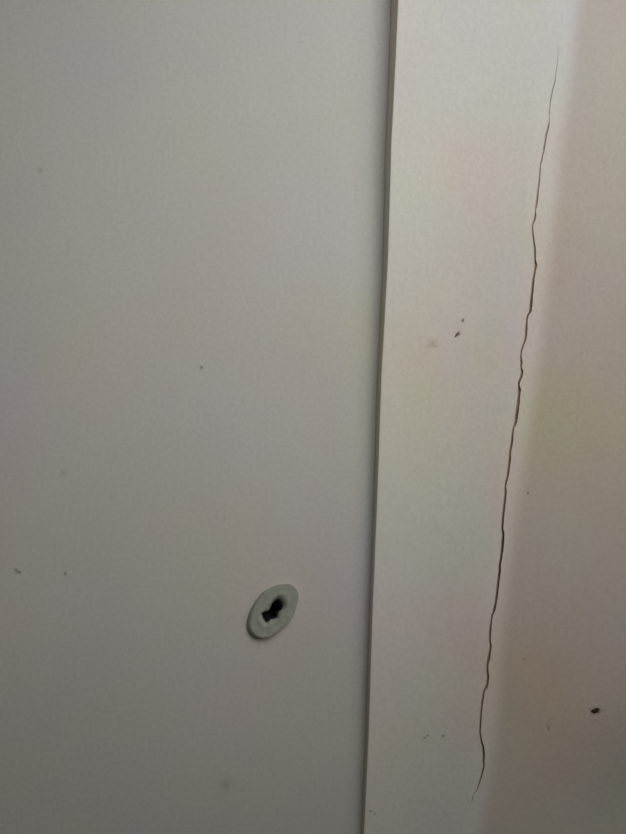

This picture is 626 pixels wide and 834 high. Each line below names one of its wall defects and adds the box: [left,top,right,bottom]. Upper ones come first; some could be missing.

crack [472,58,558,799]